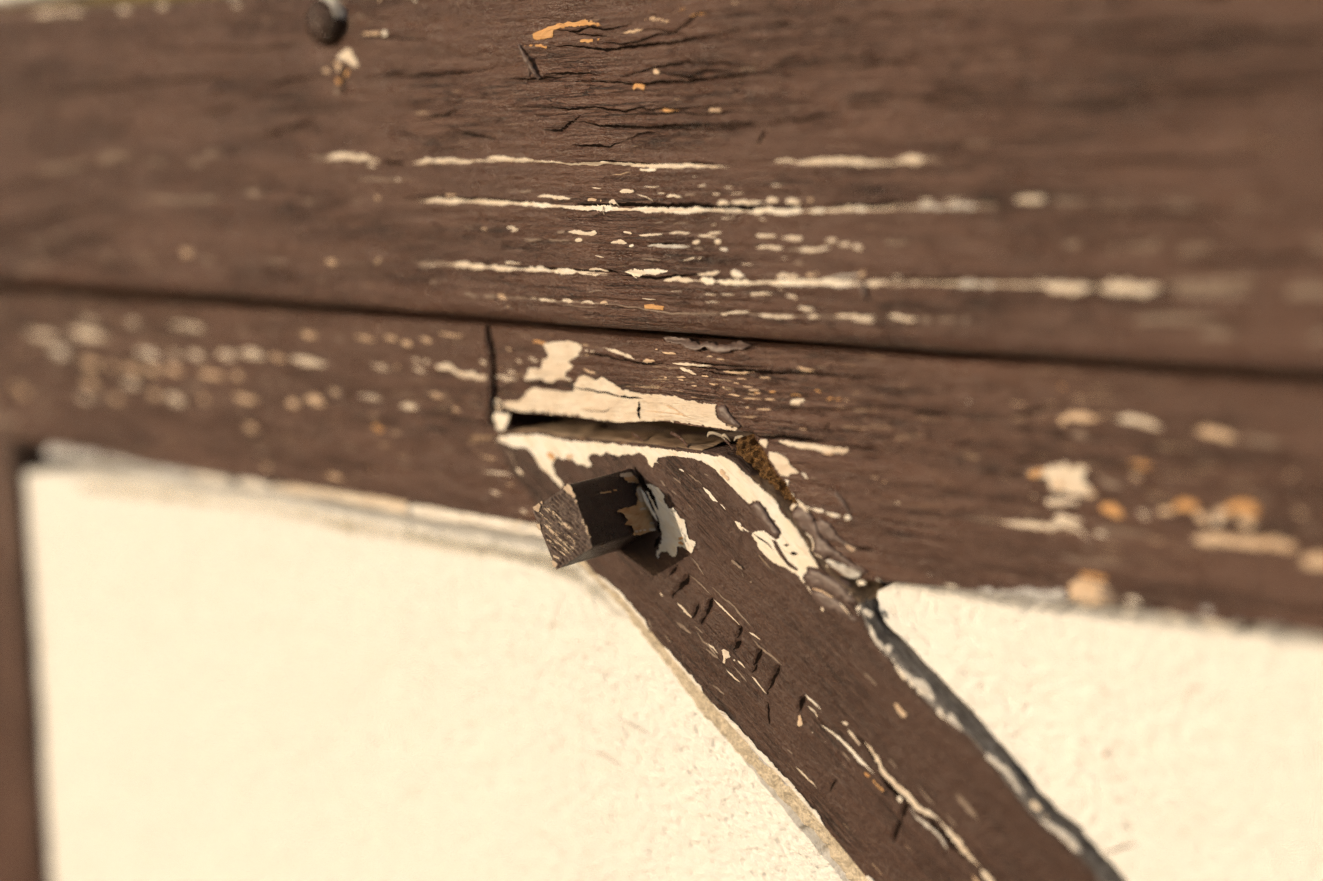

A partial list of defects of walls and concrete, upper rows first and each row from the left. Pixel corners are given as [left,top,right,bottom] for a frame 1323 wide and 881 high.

crack [341,12,920,166]
peeling [27,318,326,431]
crack [488,324,643,419]
crack [589,353,951,450]
peeling [1058,385,1100,439]
peeling [44,444,543,537]
peeling [335,325,963,730]
crack [670,565,713,624]
peeling [970,461,1323,629]
crack [733,626,805,723]
peeling [664,647,824,826]
peeling [986,753,1082,852]